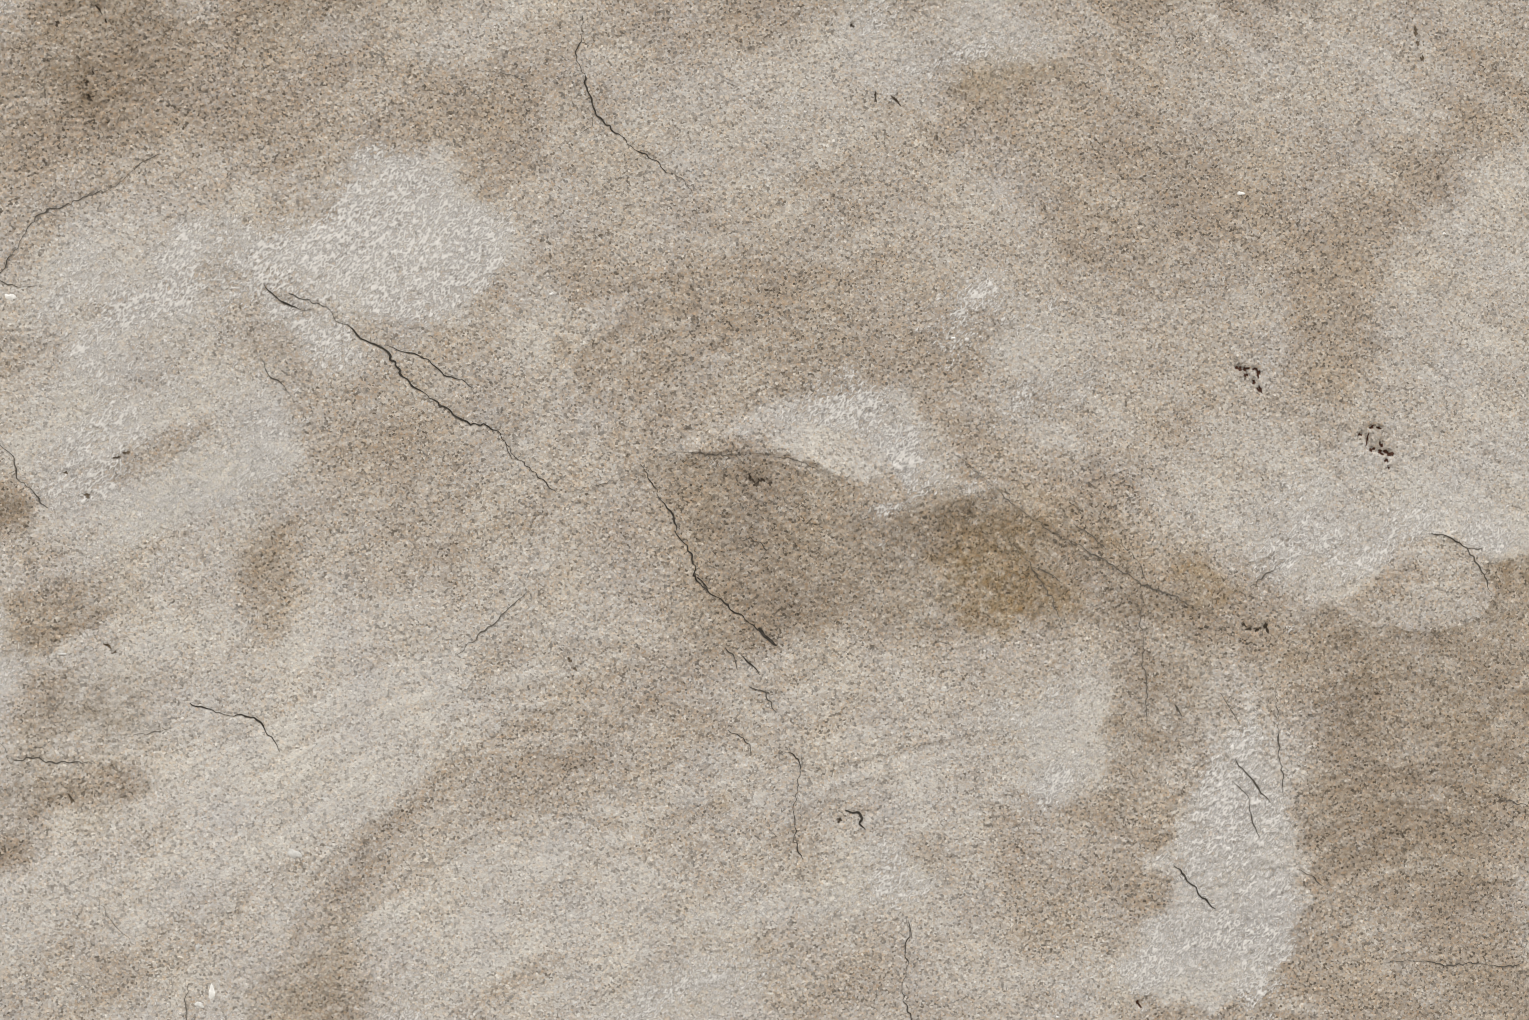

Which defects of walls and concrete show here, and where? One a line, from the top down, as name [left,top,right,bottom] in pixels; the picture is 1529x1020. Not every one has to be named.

crack [575,15,693,194]
crack [263,283,825,712]
crack [5,745,100,764]
crack [728,730,803,859]
crack [902,917,912,1020]